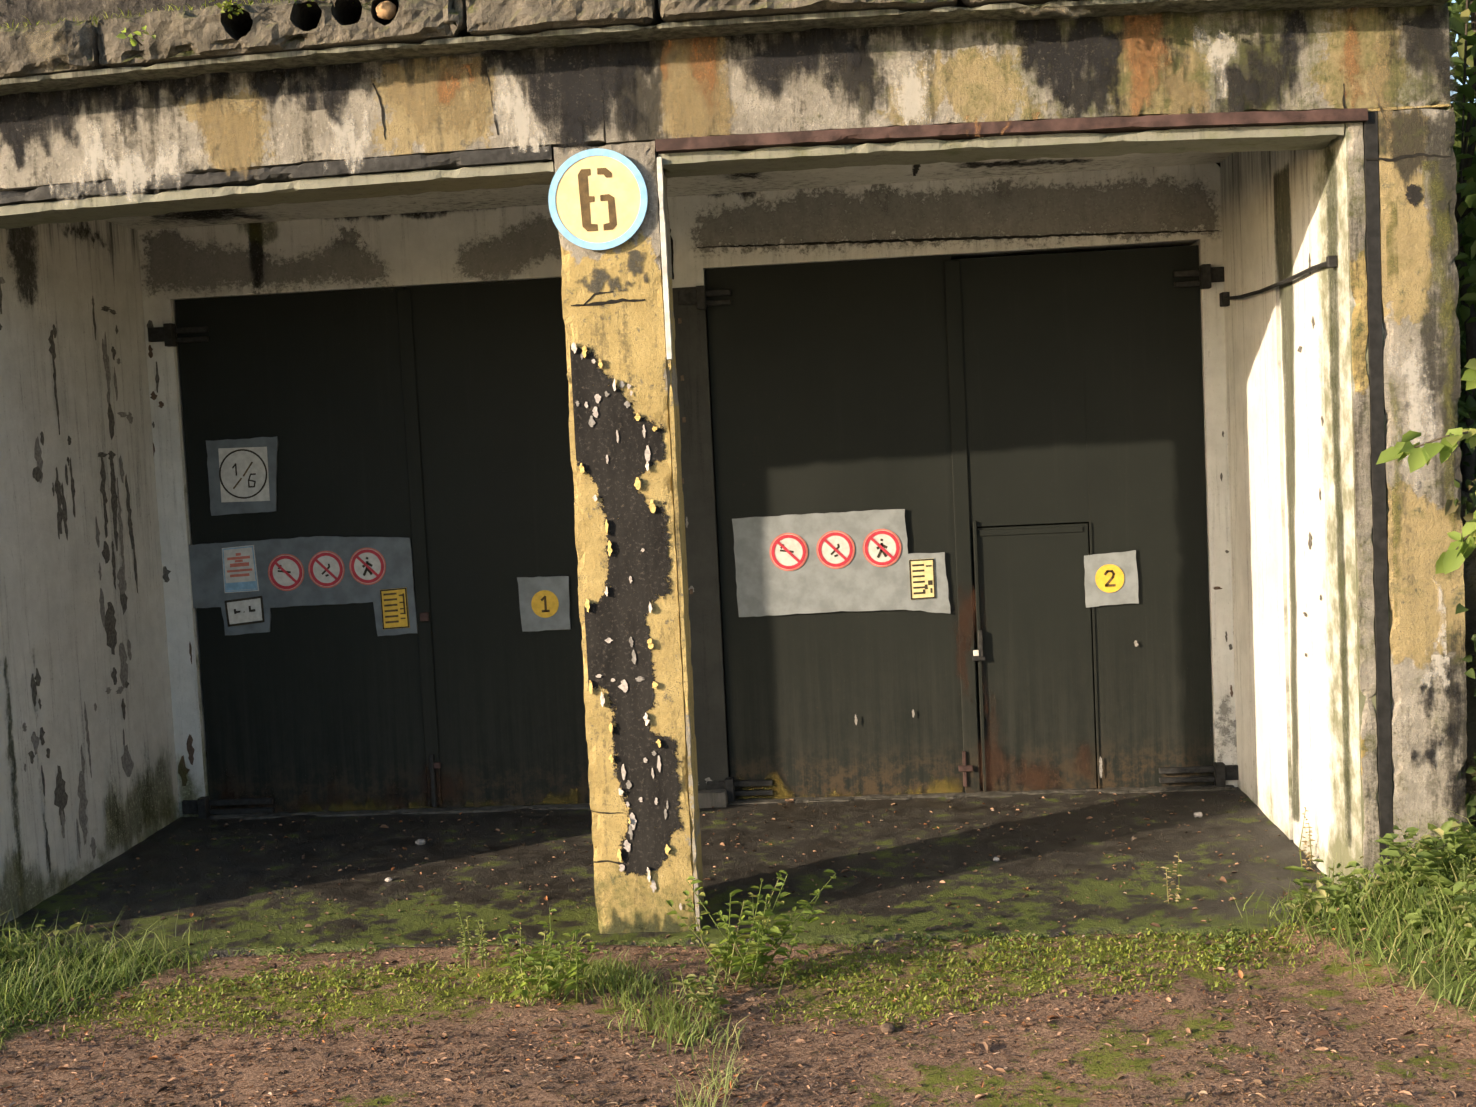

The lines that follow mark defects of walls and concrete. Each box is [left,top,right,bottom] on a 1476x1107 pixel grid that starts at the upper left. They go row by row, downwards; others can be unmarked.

water stain [0,63,375,198]
water stain [482,41,651,153]
water stain [726,27,927,123]
water stain [1015,17,1127,118]
corrosion [1124,13,1209,116]
water stain [1195,10,1307,129]
spalling [1405,184,1424,208]
peeling [147,320,164,453]
peeling [22,296,138,872]
peeling [570,342,712,892]
peeling [178,734,195,786]
water stain [1411,589,1465,815]